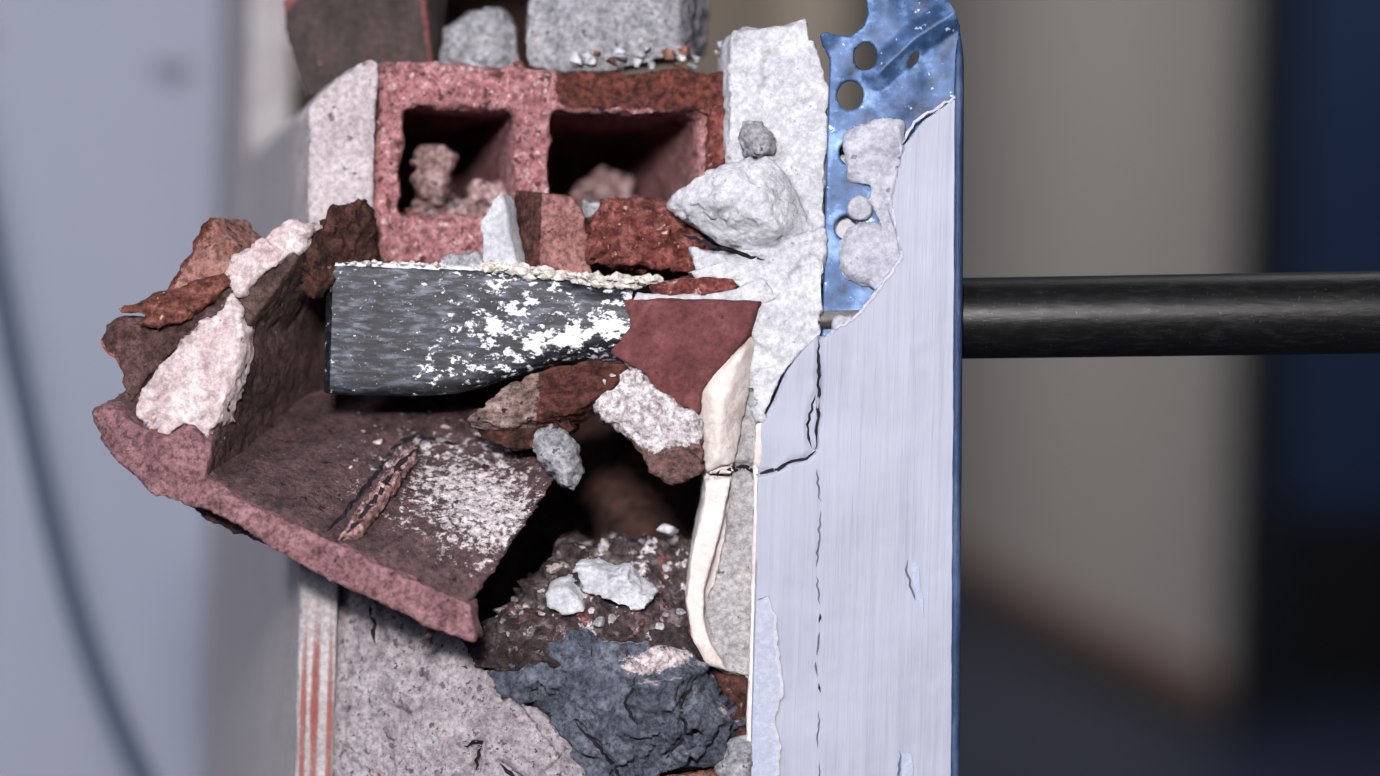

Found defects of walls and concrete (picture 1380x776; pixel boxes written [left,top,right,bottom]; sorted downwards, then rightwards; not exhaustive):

spalling [92,60,586,776]
spalling [656,524,679,536]
crack [711,336,821,776]
peeling [751,595,784,776]
spalling [633,19,955,424]